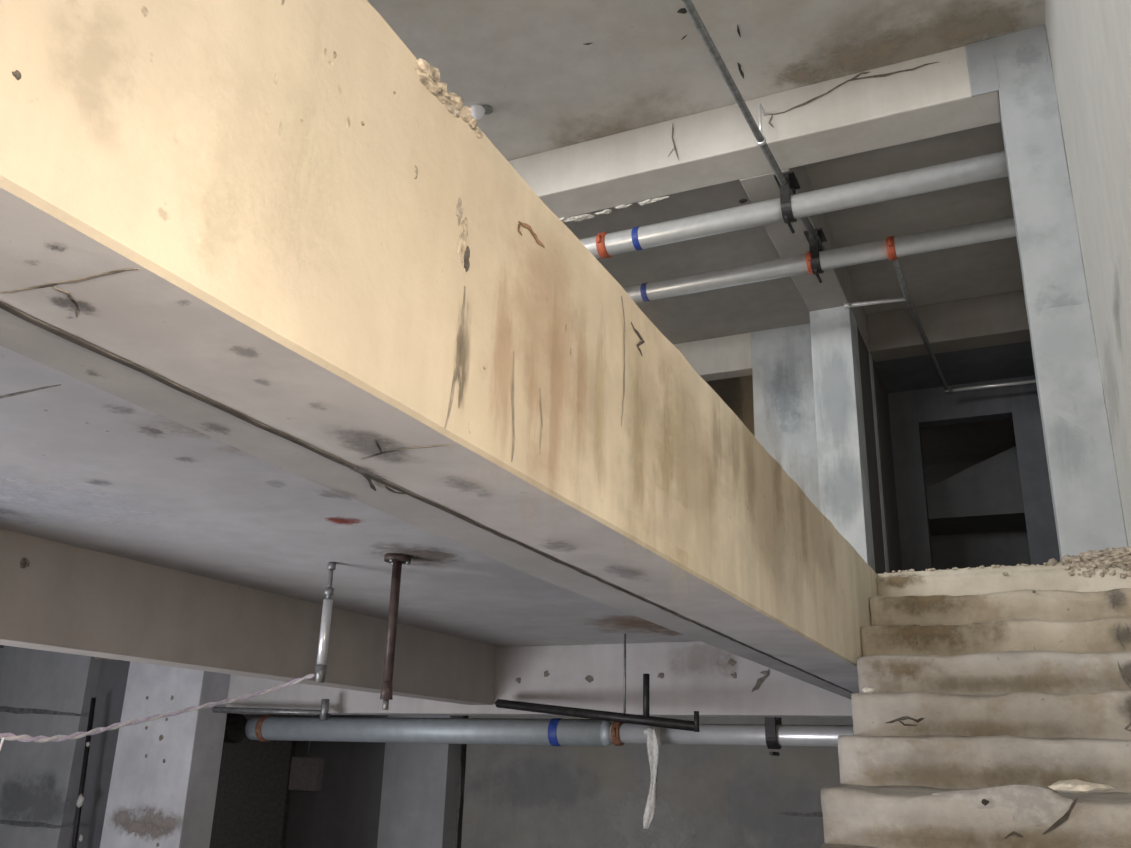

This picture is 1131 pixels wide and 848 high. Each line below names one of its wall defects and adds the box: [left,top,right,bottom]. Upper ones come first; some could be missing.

spalling [414,58,483,138]
crack [767,62,938,128]
crack [518,221,545,248]
crack [0,268,852,693]
rust [396,547,447,565]
crack [886,716,924,726]
leakage [114,809,179,839]